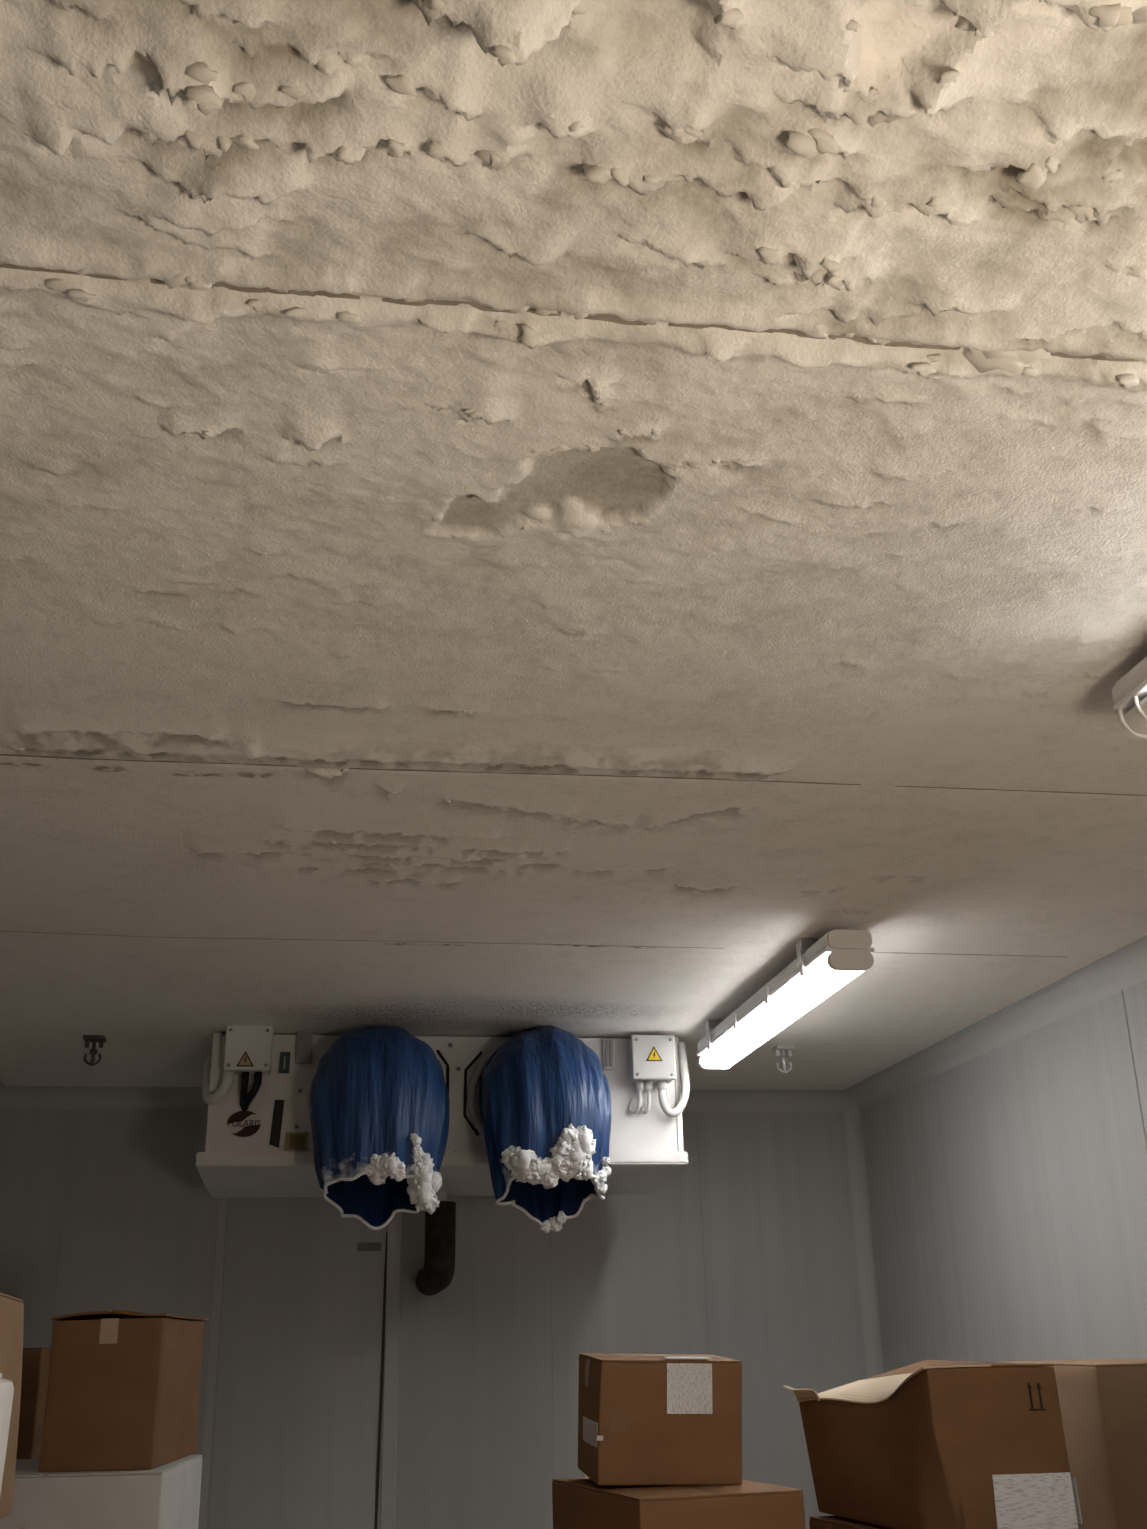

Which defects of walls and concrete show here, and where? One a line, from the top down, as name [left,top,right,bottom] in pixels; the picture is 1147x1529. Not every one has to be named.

spalling [568,0,744,82]
spalling [838,0,998,114]
peeling [1090,3,1133,28]
peeling [185,62,257,116]
peeling [383,75,442,100]
peeling [184,130,261,152]
peeling [583,164,662,186]
peeling [786,128,840,157]
peeling [1015,156,1060,189]
spalling [1103,130,1147,197]
crack [0,245,1147,391]
spalling [424,427,684,542]